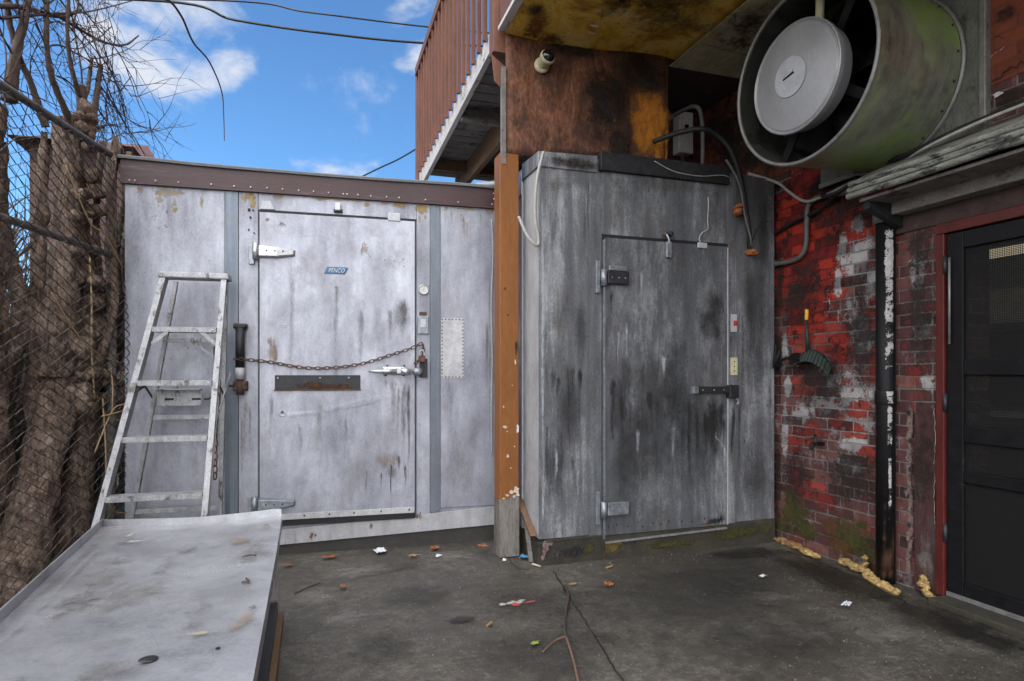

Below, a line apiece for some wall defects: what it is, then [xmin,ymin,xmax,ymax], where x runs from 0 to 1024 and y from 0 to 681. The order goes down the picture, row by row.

water stain [522,6,563,45]
rust [630,91,669,159]
peeling [137,187,184,213]
peeling [833,215,894,369]
peeling [908,249,927,292]
rust [297,382,352,390]
water stain [610,380,643,440]
peeling [886,391,894,445]
peeling [908,365,936,394]
spalling [904,407,914,578]
crack [553,570,624,681]